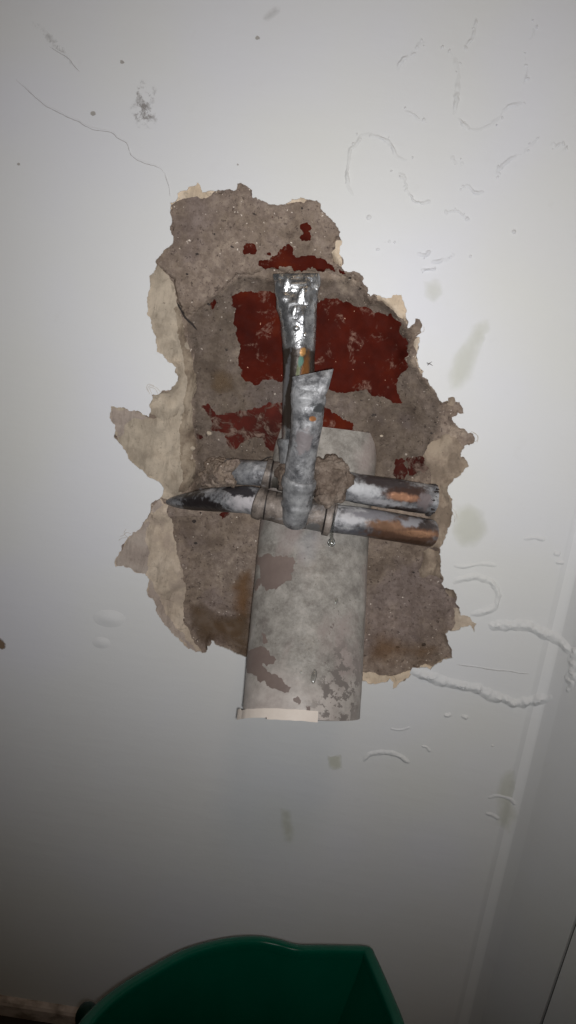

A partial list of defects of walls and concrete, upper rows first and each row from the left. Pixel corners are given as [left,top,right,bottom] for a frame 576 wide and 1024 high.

crack [19,81,171,195]
flaking render [110,183,478,711]